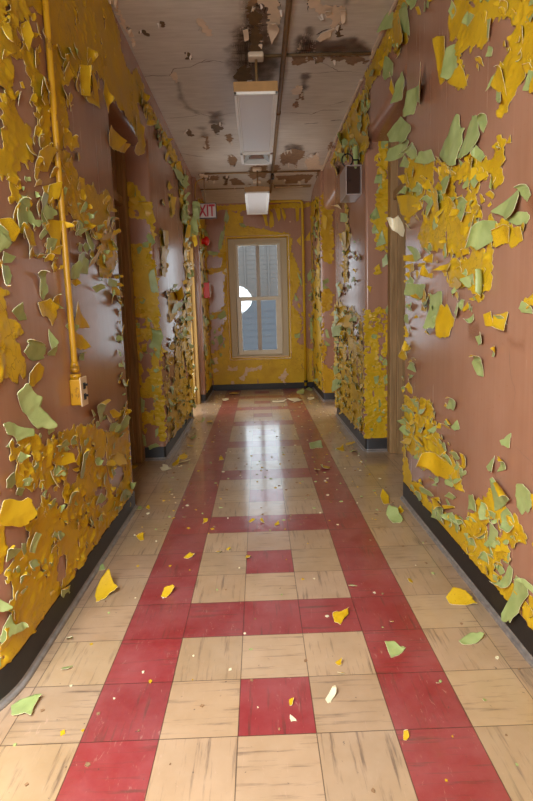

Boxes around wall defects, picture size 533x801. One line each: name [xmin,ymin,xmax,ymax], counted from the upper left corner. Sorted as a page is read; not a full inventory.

peeling [0,0,388,670]
damp [234,3,278,81]
damp [295,31,367,53]
peeling [184,0,533,630]